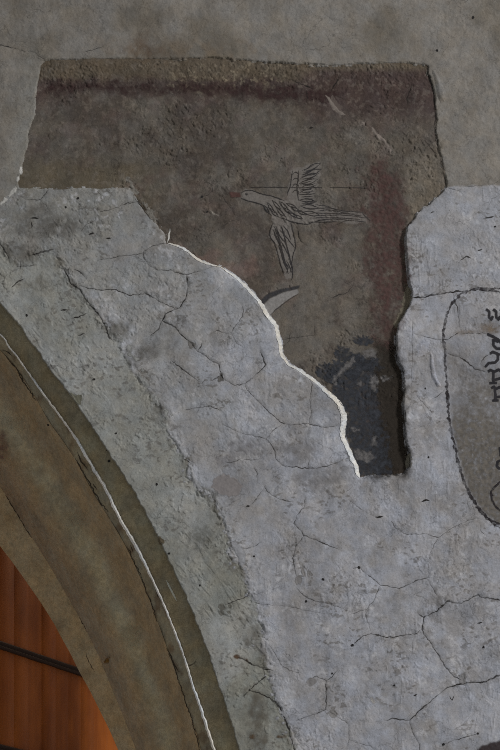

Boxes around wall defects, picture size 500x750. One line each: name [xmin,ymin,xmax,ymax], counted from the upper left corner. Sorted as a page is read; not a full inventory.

peeling [325,95,345,115]
crack [64,269,251,394]
flaking render [167,231,360,478]
flaking render [393,286,412,328]
crack [411,290,490,412]
crack [255,384,334,469]
crack [75,455,108,512]
crack [129,547,158,618]
crack [227,459,418,613]
crack [167,650,199,747]
crack [239,657,336,750]
crack [354,590,500,721]